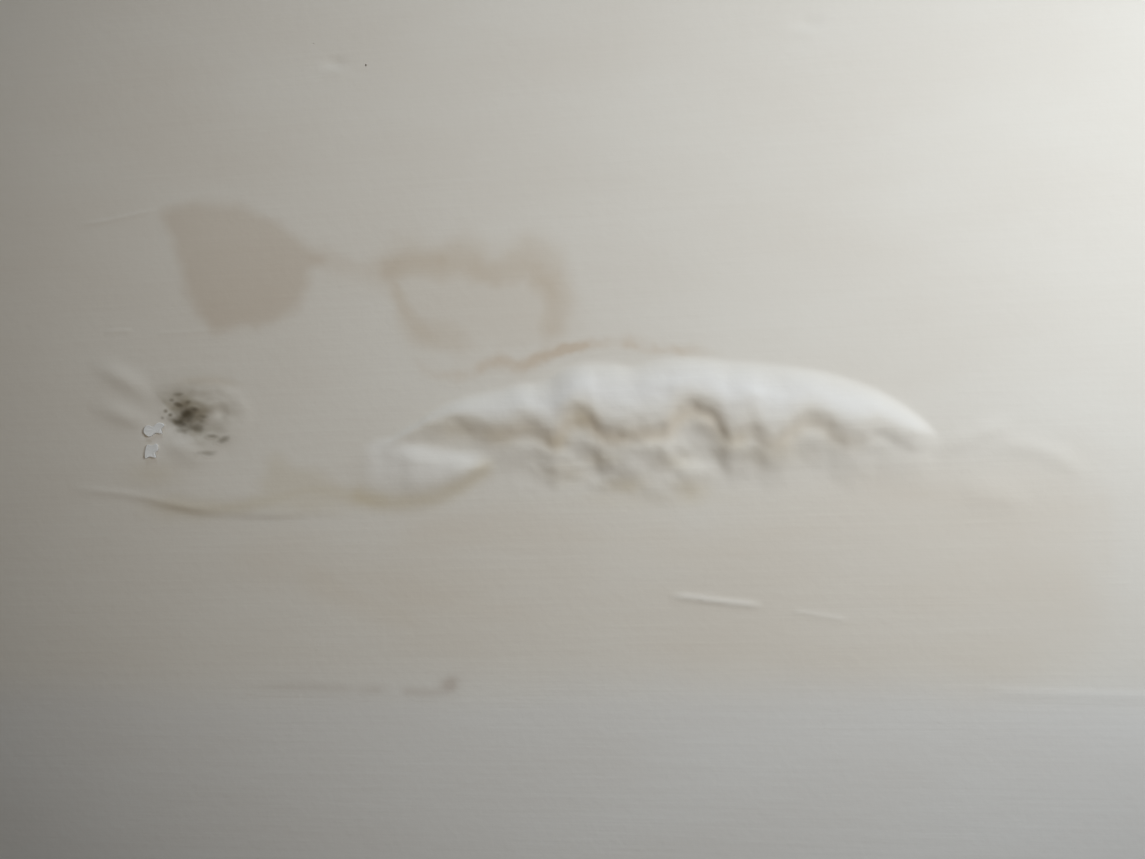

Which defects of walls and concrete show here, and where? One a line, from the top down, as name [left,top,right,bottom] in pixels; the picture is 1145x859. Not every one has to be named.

damp [154,191,725,389]
peeling [86,350,263,469]